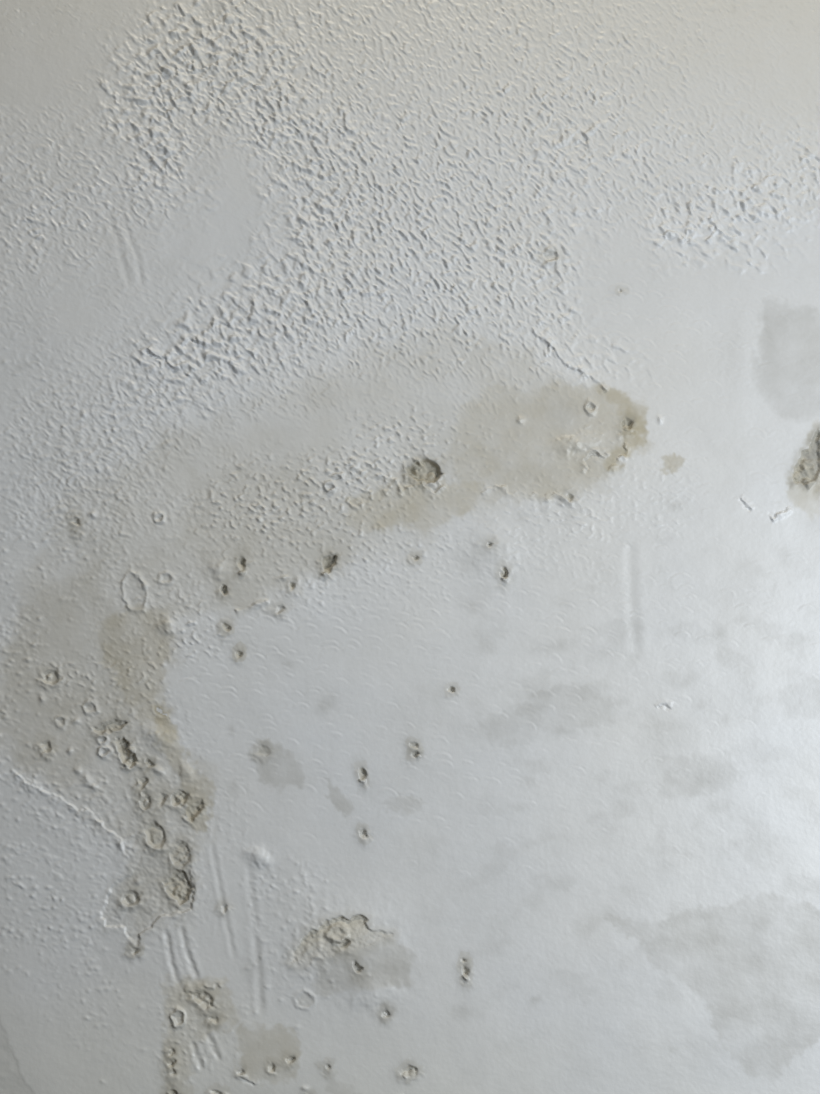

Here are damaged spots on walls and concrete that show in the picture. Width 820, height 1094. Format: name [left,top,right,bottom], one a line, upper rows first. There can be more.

peeling [373,455,456,504]
spalling [761,423,820,526]
water stain [0,308,688,942]
spalling [1,715,209,949]
spalling [285,909,400,970]
peeling [174,974,234,1015]